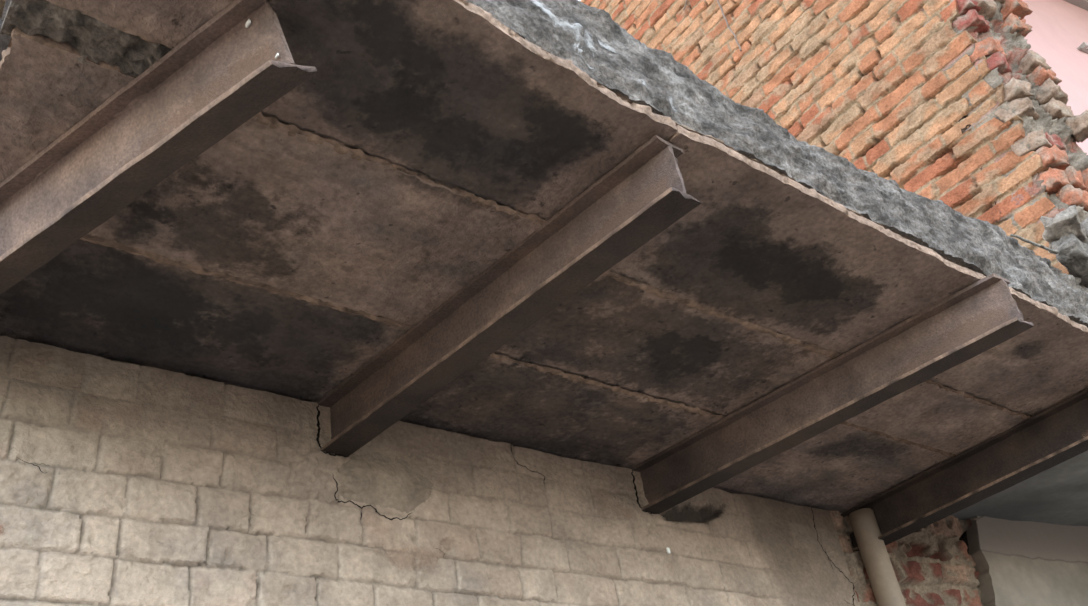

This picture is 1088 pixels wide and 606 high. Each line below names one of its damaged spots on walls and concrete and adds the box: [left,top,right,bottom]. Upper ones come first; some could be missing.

leakage [532,0,614,53]
crack [316,405,411,520]
flaking render [829,511,878,606]
flaking render [885,515,984,606]